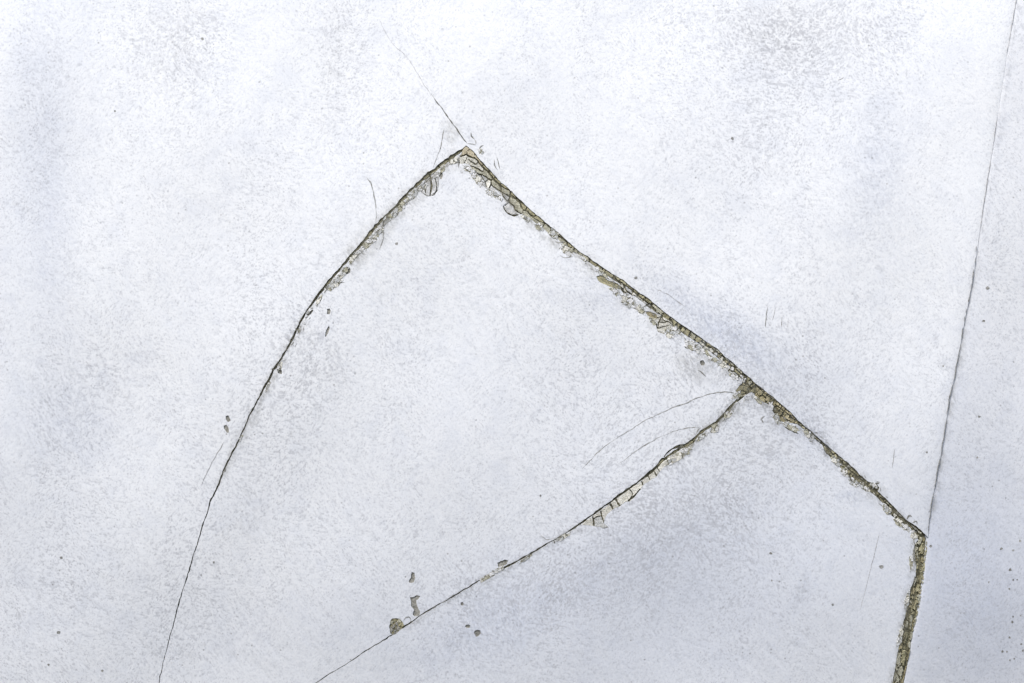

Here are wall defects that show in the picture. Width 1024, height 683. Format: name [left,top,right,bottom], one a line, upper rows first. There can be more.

crack [159,21,976,683]
crack [980,121,997,227]